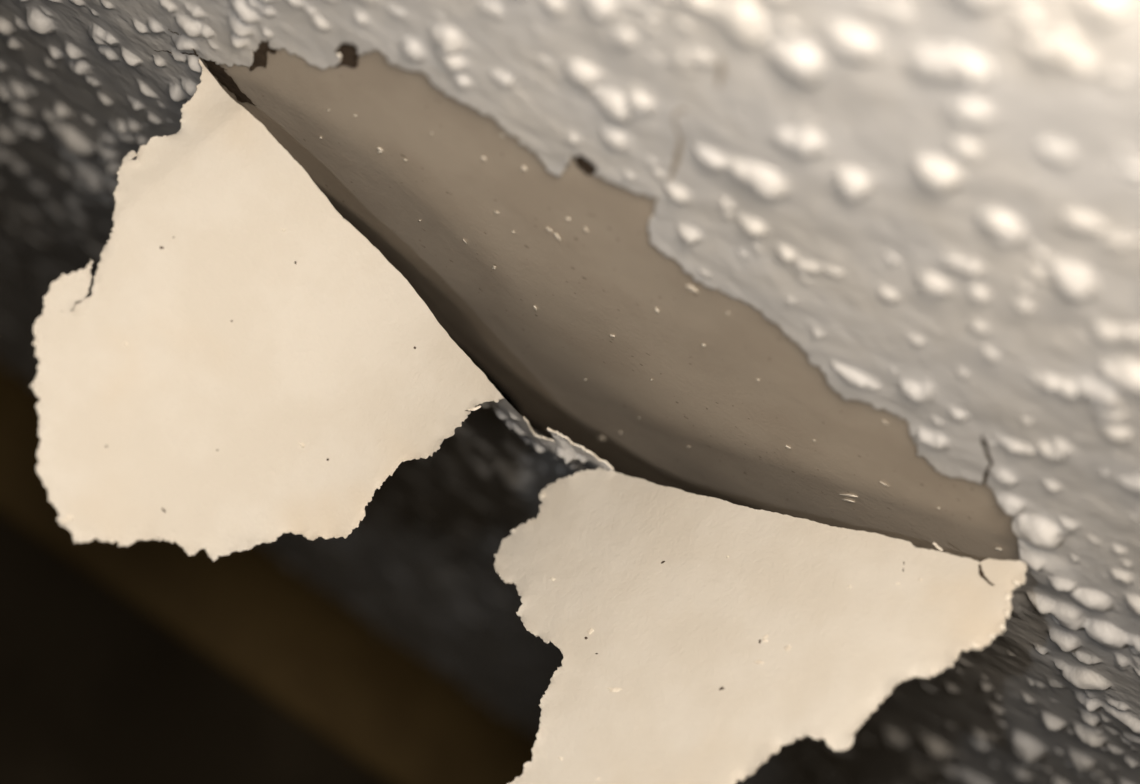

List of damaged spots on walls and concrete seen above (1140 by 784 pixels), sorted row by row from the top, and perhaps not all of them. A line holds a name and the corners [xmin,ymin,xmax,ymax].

peeling [249,40,277,71]
peeling [335,43,359,68]
peeling [29,59,504,561]
peeling [199,49,1028,784]